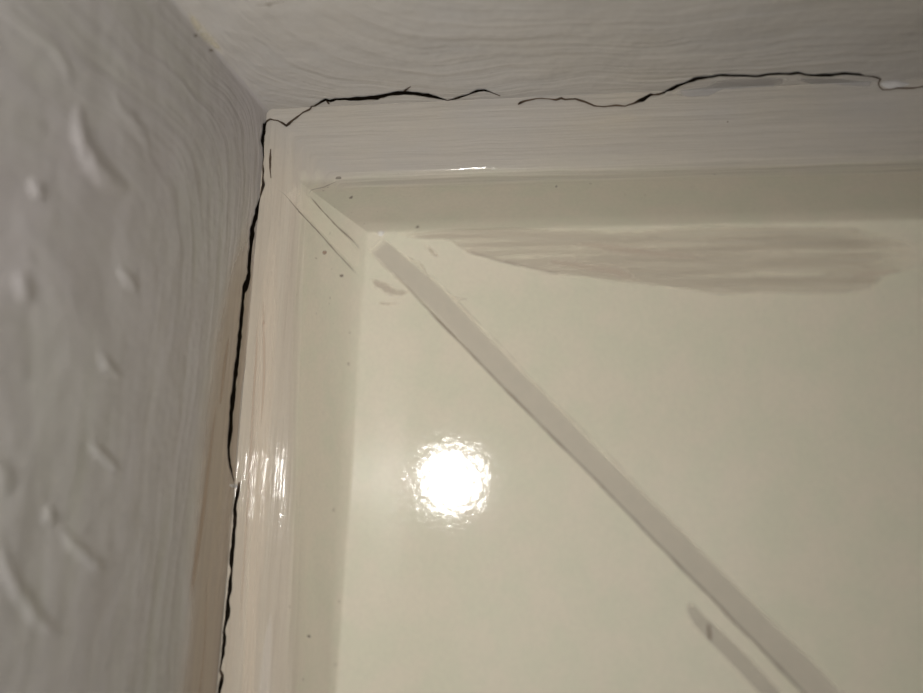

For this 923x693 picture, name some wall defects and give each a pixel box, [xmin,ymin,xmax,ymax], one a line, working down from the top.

crack [218,72,923,693]